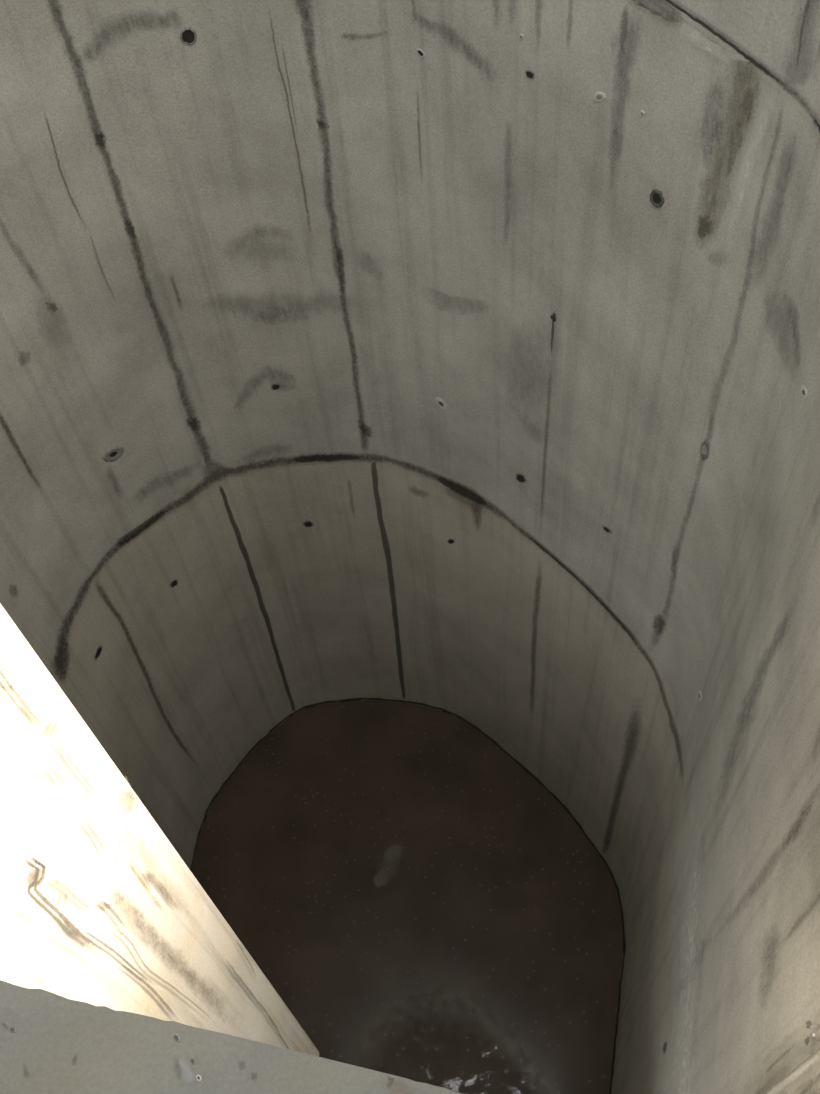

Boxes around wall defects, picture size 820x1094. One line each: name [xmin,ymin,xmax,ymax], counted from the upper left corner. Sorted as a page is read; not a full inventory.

crack [47,122,78,211]
crack [272,29,308,212]